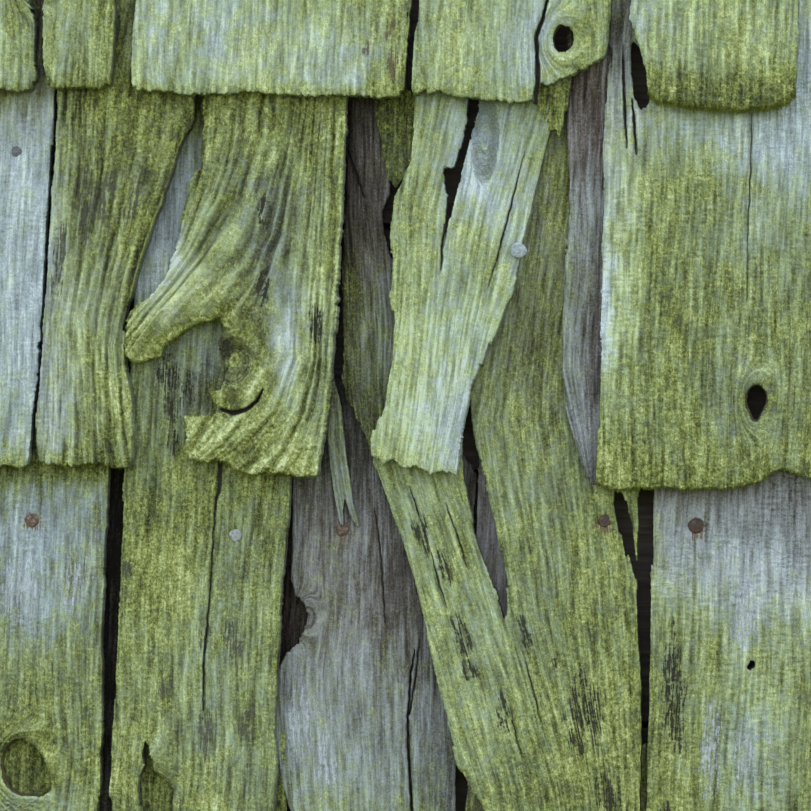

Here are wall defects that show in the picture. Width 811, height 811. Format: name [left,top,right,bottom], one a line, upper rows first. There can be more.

crack [533,0,548,105]
crack [439,224,447,269]
crack [202,461,222,709]
crack [407,644,420,811]